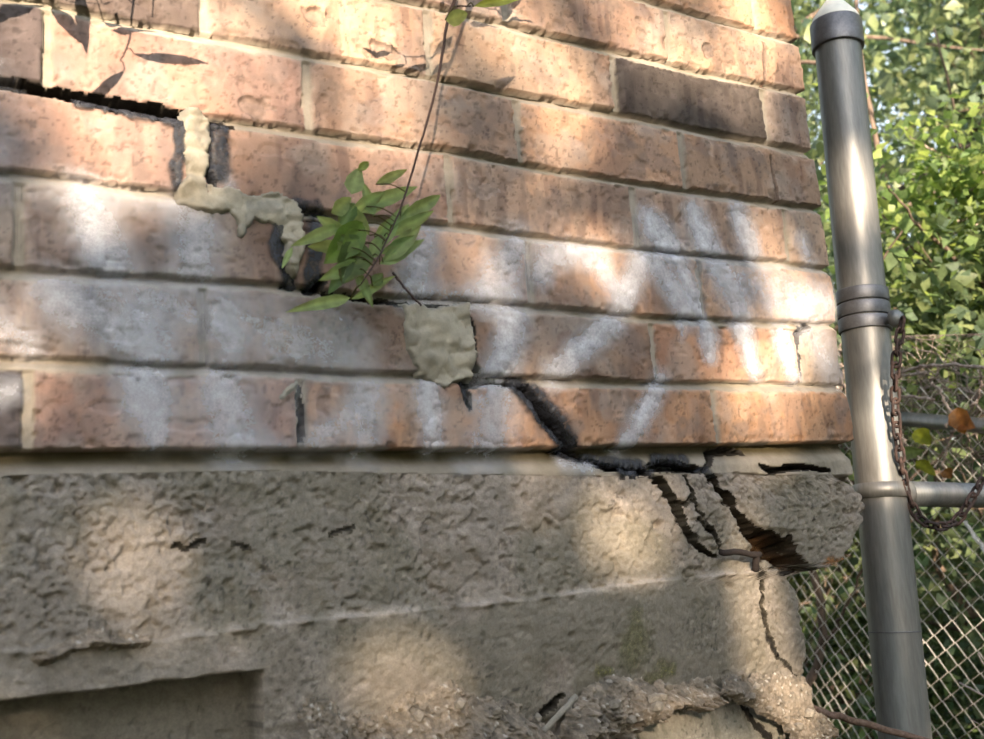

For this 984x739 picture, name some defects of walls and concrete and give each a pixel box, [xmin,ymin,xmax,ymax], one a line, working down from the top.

crack [0,76,183,122]
crack [301,273,449,309]
crack [457,317,529,411]
crack [533,415,619,472]
crack [647,447,831,558]
crack [755,566,797,677]
crack [534,692,566,720]
spalling [289,670,839,739]
crack [739,705,773,739]